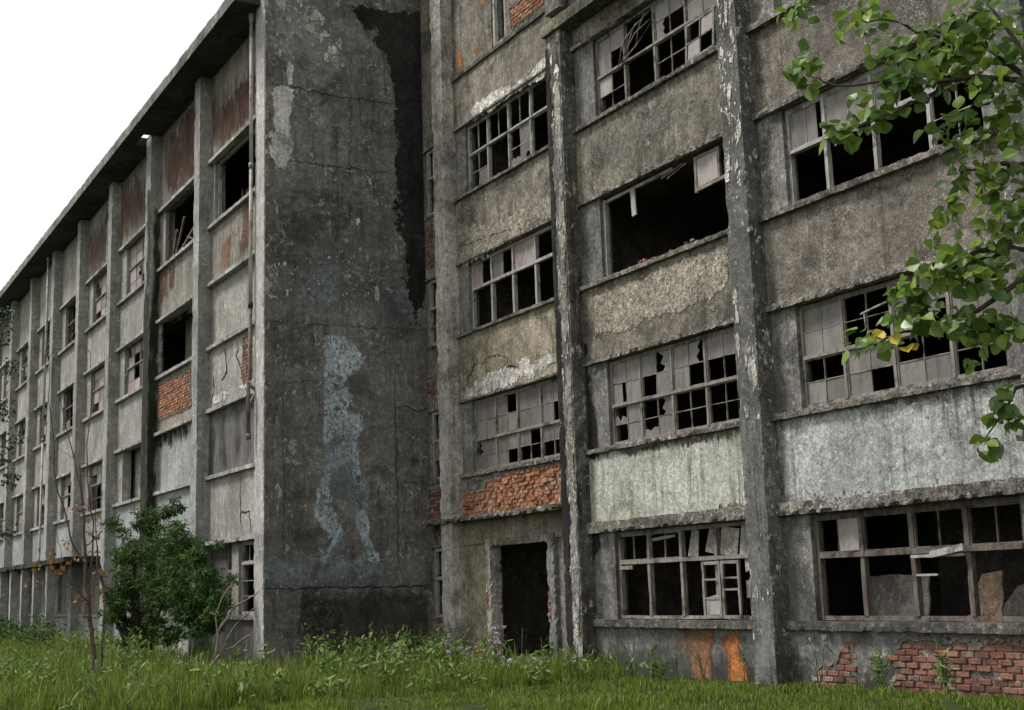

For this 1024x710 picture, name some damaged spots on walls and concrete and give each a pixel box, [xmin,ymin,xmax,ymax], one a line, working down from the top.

flaking render [275,0,345,70]
corrosion [162,108,196,206]
corrosion [212,69,256,153]
peeling [269,43,295,169]
crack [269,63,394,177]
flaking render [266,219,380,301]
water stain [145,190,186,582]
flaking render [157,368,192,424]
crack [466,354,516,381]
flaking render [456,56,583,663]
corrosion [682,628,747,681]
flaking render [812,633,1024,701]